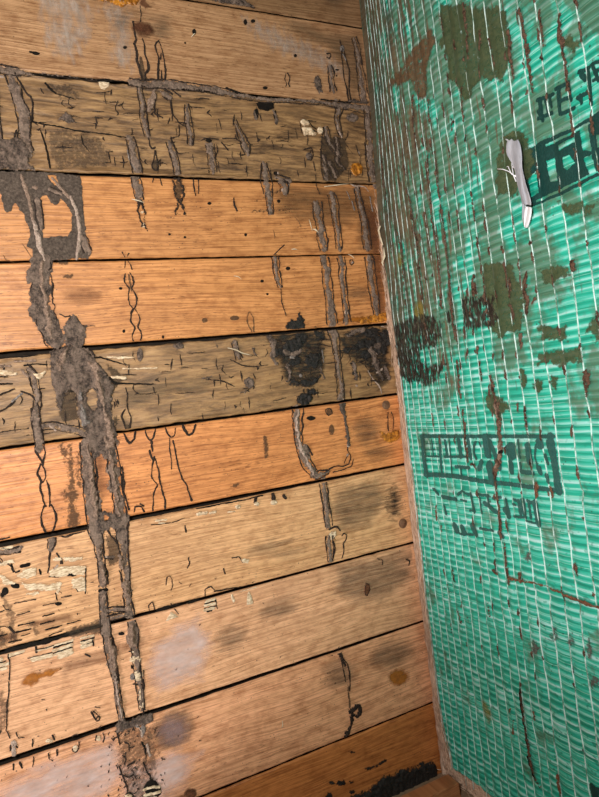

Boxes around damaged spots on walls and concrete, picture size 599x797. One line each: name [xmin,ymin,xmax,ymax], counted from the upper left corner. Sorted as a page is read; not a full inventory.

water stain [267,312,325,387]
water stain [338,304,451,394]
water stain [460,294,498,331]
peeling [0,536,95,680]
water stain [325,761,438,797]